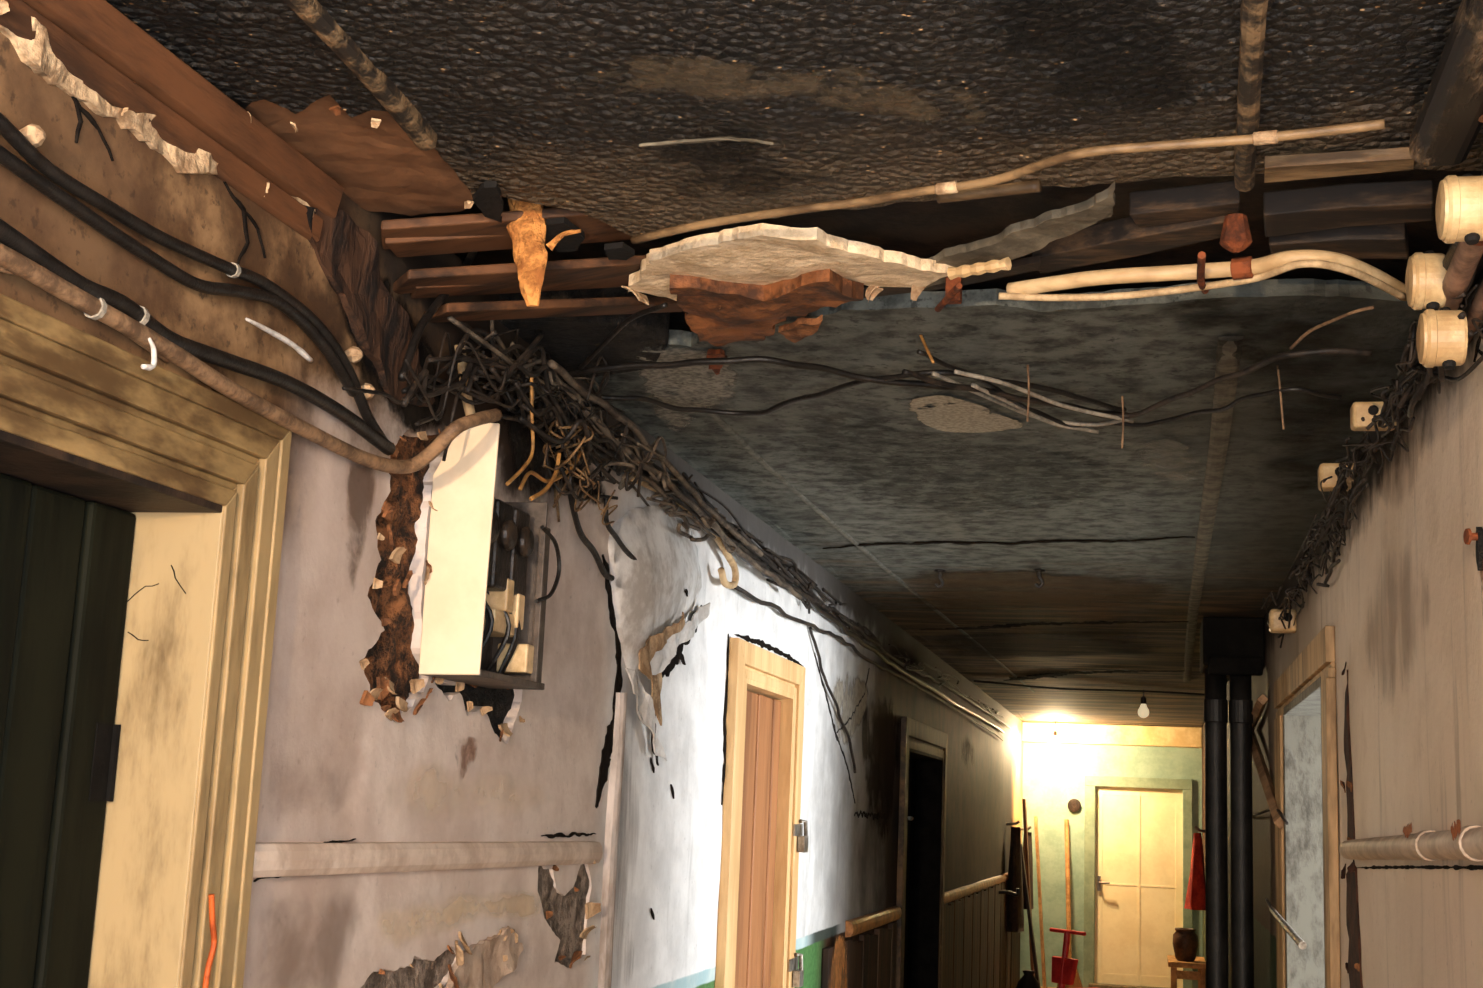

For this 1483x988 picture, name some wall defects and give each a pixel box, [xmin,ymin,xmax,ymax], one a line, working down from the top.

flaking render [0,0,218,175]
flaking render [621,181,1115,305]
flaking render [778,314,823,343]
flaking render [359,426,525,742]
crack [541,554,623,839]
crack [650,714,659,766]
crack [662,605,887,820]
flaking render [361,931,472,988]
flaking render [538,861,601,968]